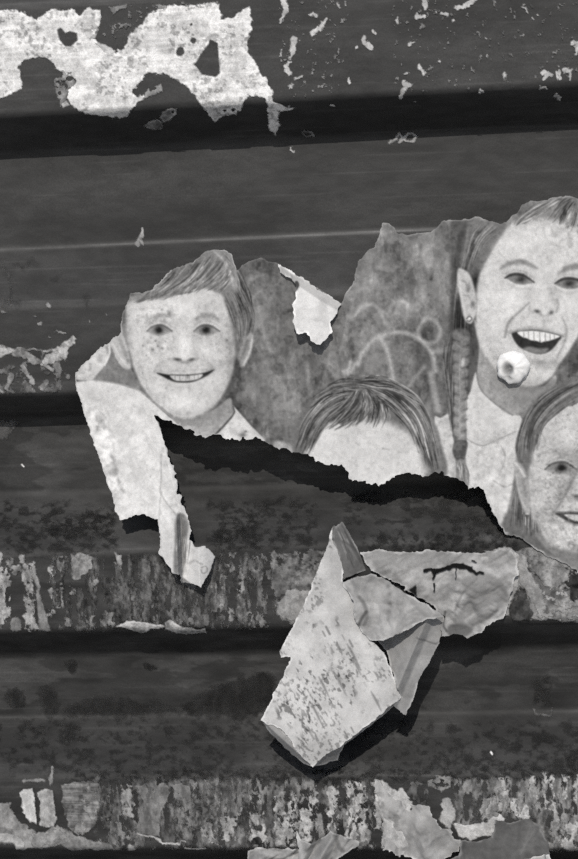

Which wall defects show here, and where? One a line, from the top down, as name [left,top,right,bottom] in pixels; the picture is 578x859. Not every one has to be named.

peeling [0,2,293,135]
peeling [279,0,346,97]
peeling [534,24,578,101]
peeling [71,552,93,580]
peeling [116,620,207,634]
peeling [19,766,57,827]